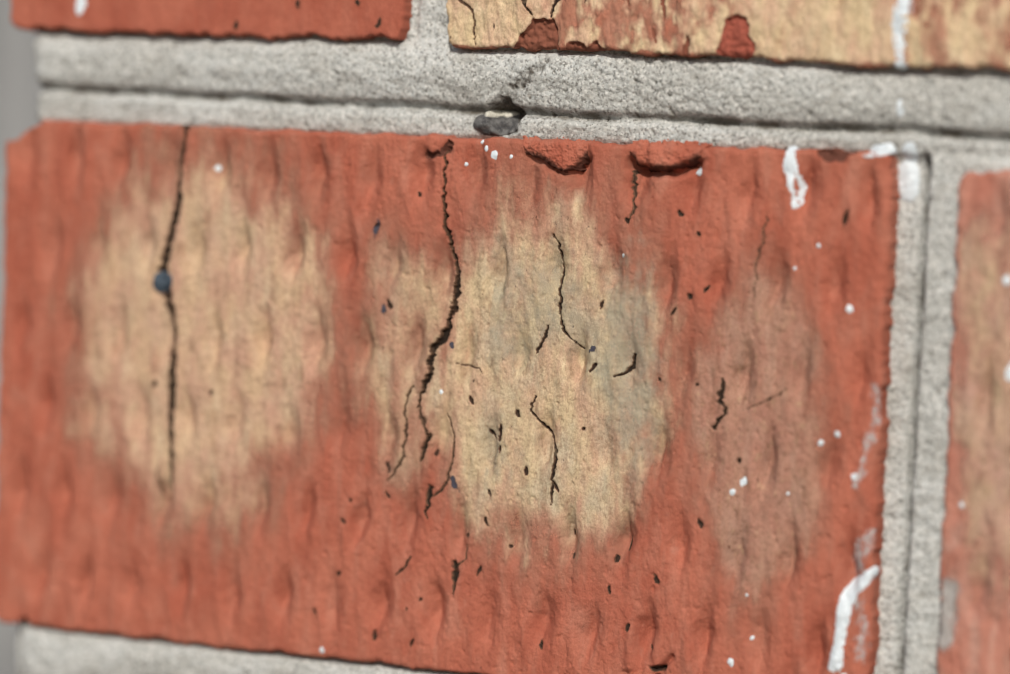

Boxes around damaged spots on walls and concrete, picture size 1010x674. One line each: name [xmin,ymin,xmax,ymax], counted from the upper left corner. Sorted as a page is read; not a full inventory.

crack [521,0,560,20]
spalling [515,18,605,52]
damp [446,0,1010,70]
spalling [716,15,755,59]
peeling [522,135,595,173]
peeling [630,139,713,172]
crack [156,127,191,502]
crack [387,150,483,519]
crack [536,233,585,354]
crack [613,353,637,377]
crack [530,395,558,505]
peeling [628,665,668,674]